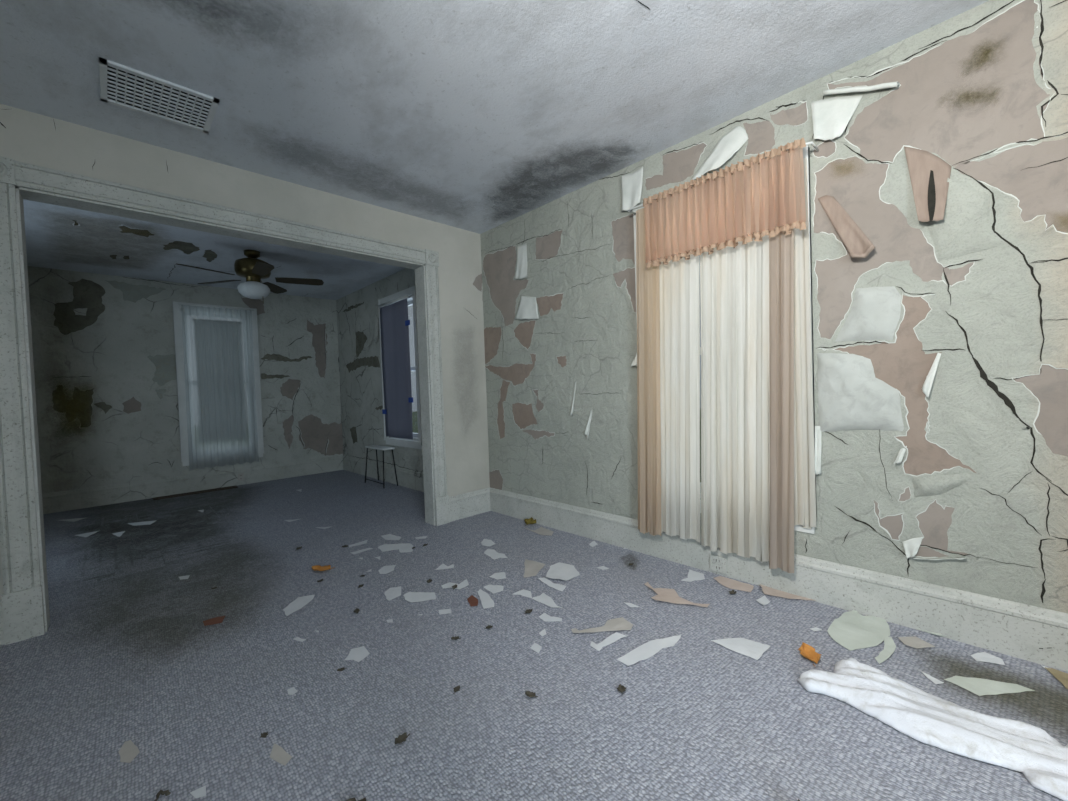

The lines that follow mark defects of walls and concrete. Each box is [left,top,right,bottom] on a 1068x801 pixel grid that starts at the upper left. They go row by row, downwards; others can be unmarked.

damp [500,151,621,215]
crack [663,0,1068,603]